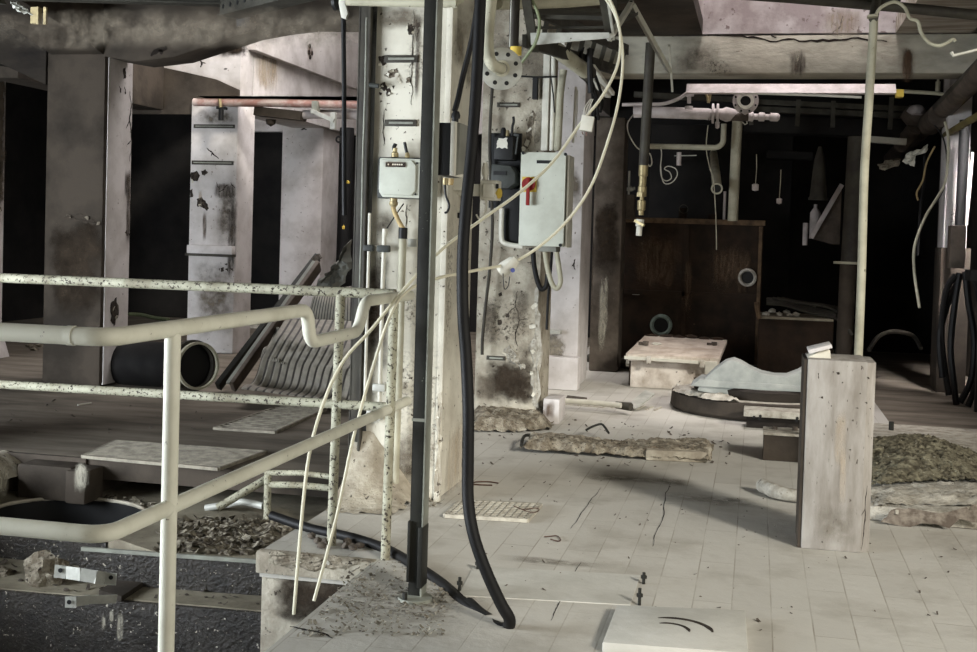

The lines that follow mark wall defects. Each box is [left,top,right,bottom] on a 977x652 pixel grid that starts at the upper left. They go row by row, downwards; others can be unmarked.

crack [708,16,887,43]
spalling [190,169,209,211]
peeling [501,287,543,408]
water stain [478,351,532,402]